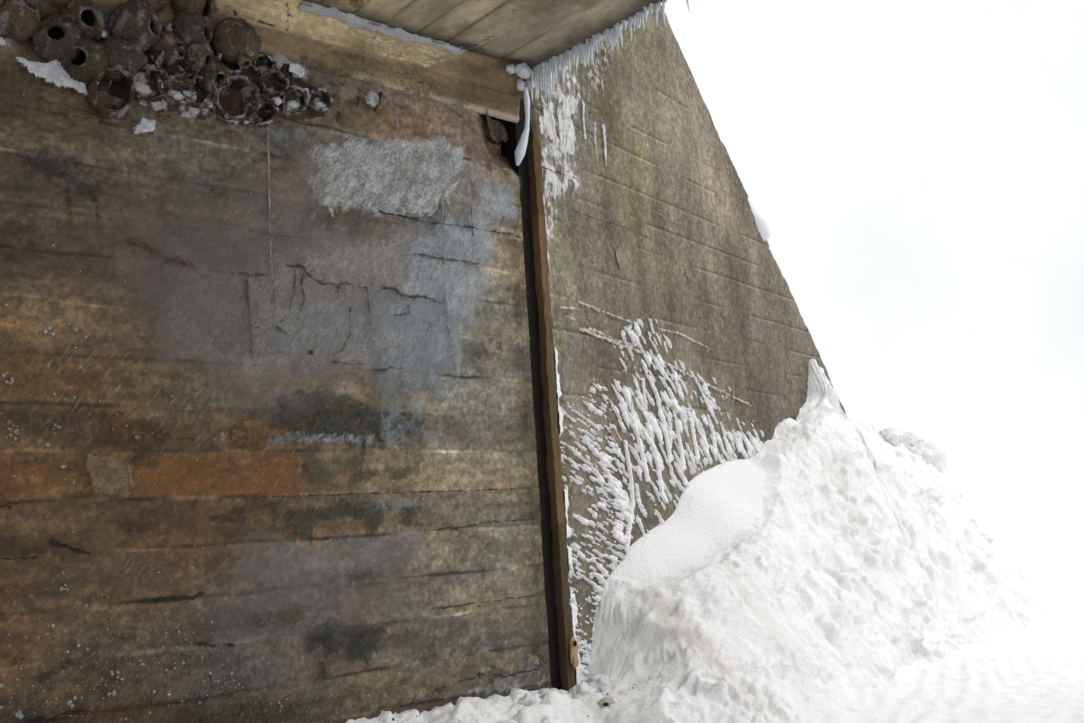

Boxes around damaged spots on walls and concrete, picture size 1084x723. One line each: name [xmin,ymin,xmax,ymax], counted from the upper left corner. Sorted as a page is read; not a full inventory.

crack [239,230,442,372]